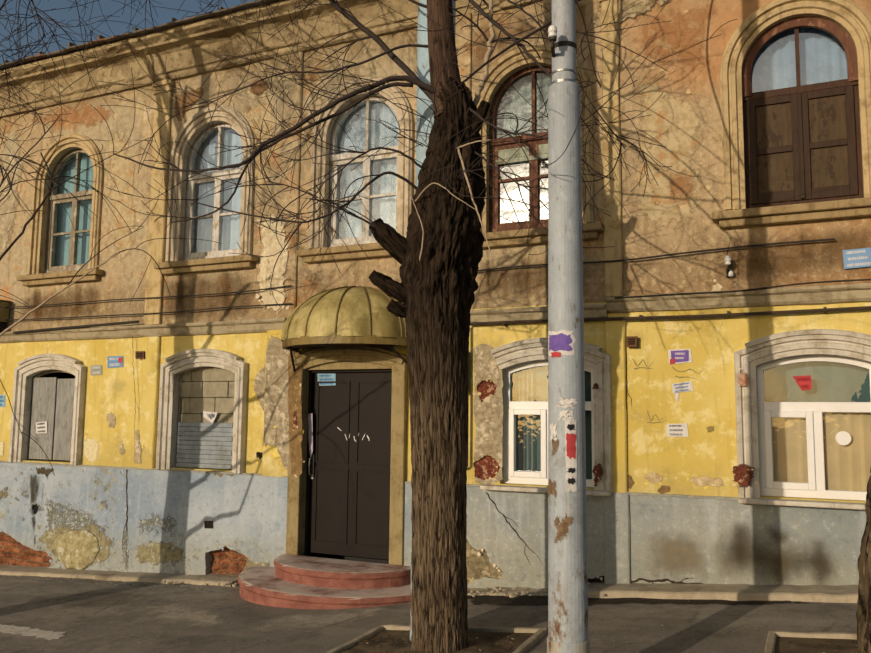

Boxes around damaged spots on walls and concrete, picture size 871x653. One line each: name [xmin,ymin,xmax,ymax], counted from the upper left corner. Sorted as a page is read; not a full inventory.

peeling [618,0,715,229]
peeling [252,333,305,478]
peeling [470,344,504,485]
spalling [0,496,186,569]
crack [121,470,129,564]
spalling [210,547,269,575]
spalling [466,539,504,585]
crack [486,492,543,565]
water stain [730,529,825,577]